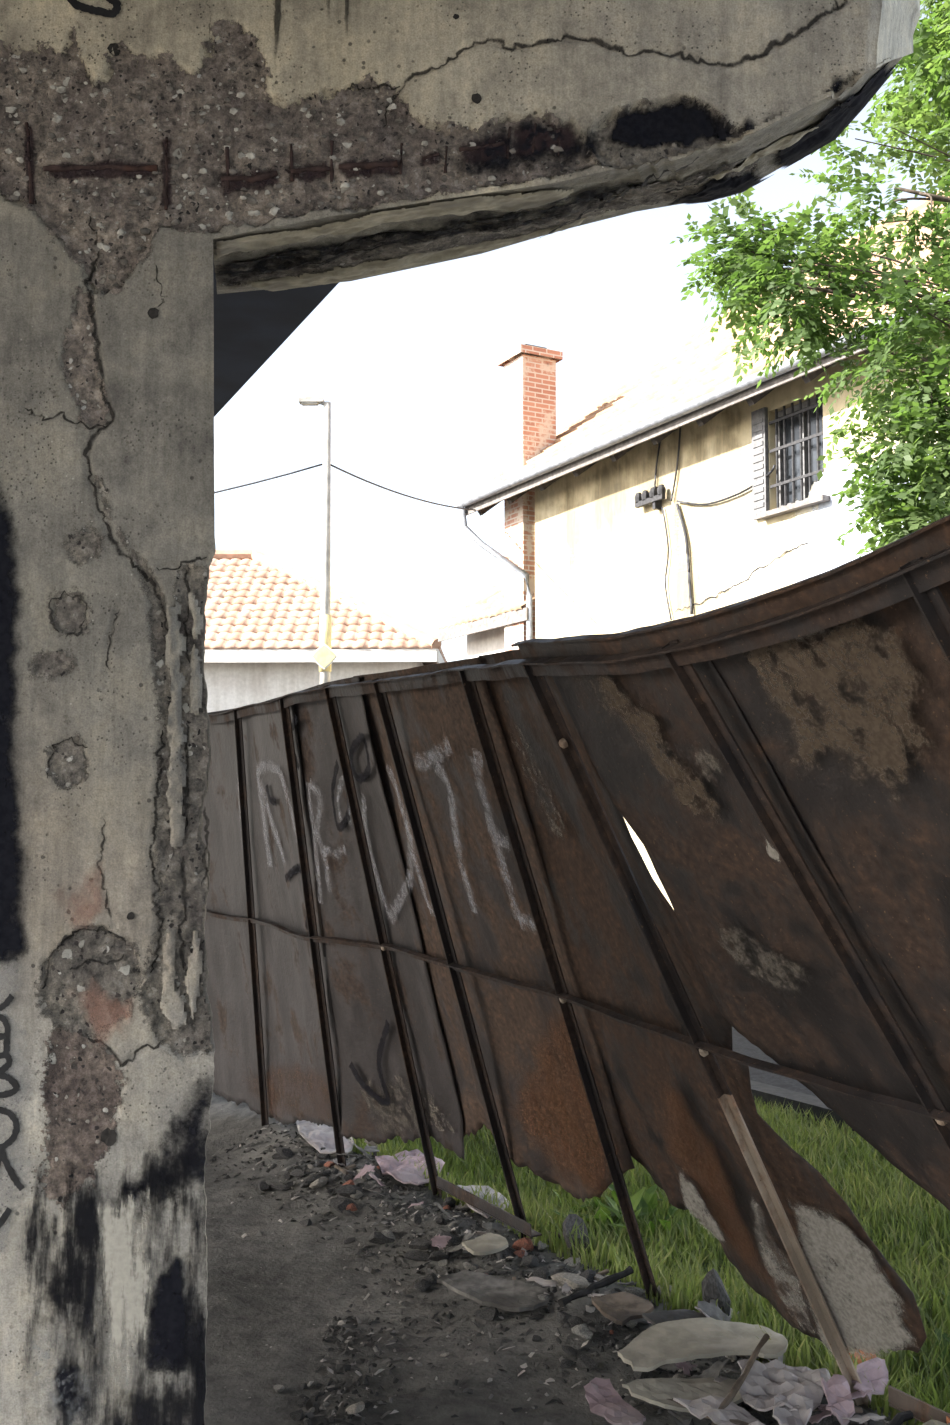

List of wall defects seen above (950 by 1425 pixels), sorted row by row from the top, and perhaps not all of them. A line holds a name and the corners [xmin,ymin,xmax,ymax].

spalling [0,20,818,429]
crack [347,0,848,127]
crack [25,216,207,670]
spalling [27,475,212,1209]
peeling [98,1199,151,1369]